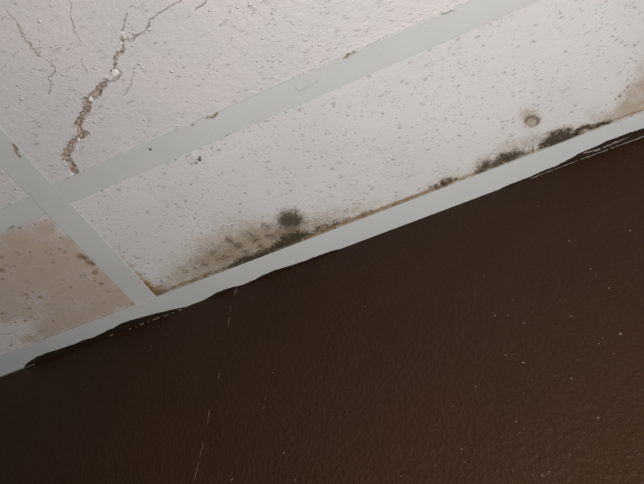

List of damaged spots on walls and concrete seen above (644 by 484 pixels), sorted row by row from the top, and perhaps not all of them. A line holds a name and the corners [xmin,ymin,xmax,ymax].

crack [7,11,56,93]
crack [61,0,181,174]
damp [0,225,135,338]
damp [157,122,611,294]